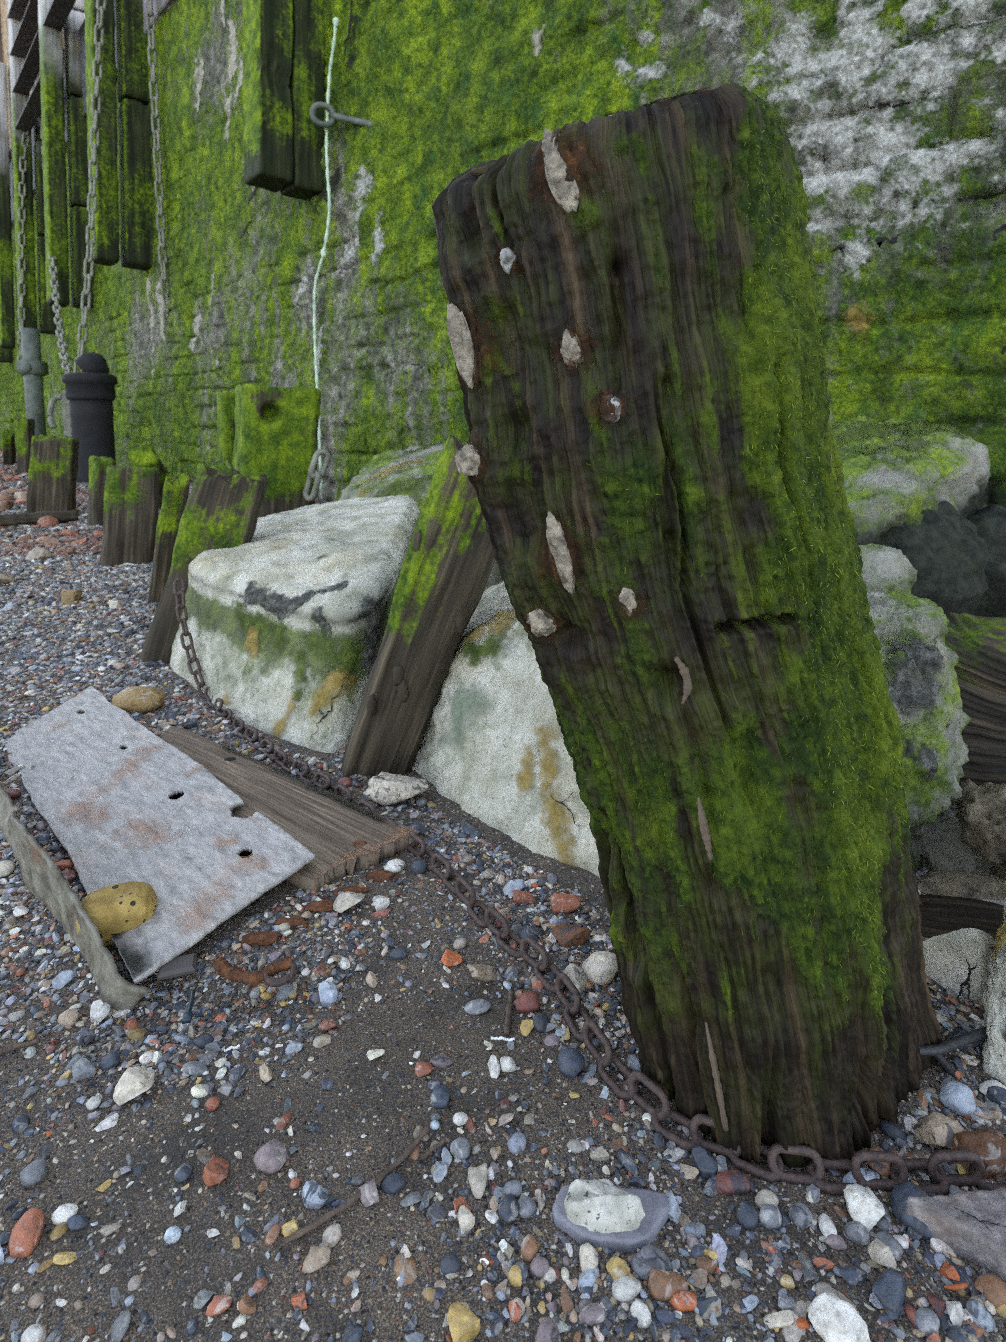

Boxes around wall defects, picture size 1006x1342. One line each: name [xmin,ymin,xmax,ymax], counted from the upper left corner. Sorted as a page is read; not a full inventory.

rust [246,628,258,656]
rust [310,671,355,715]
rust [274,694,295,738]
rust [517,728,573,866]